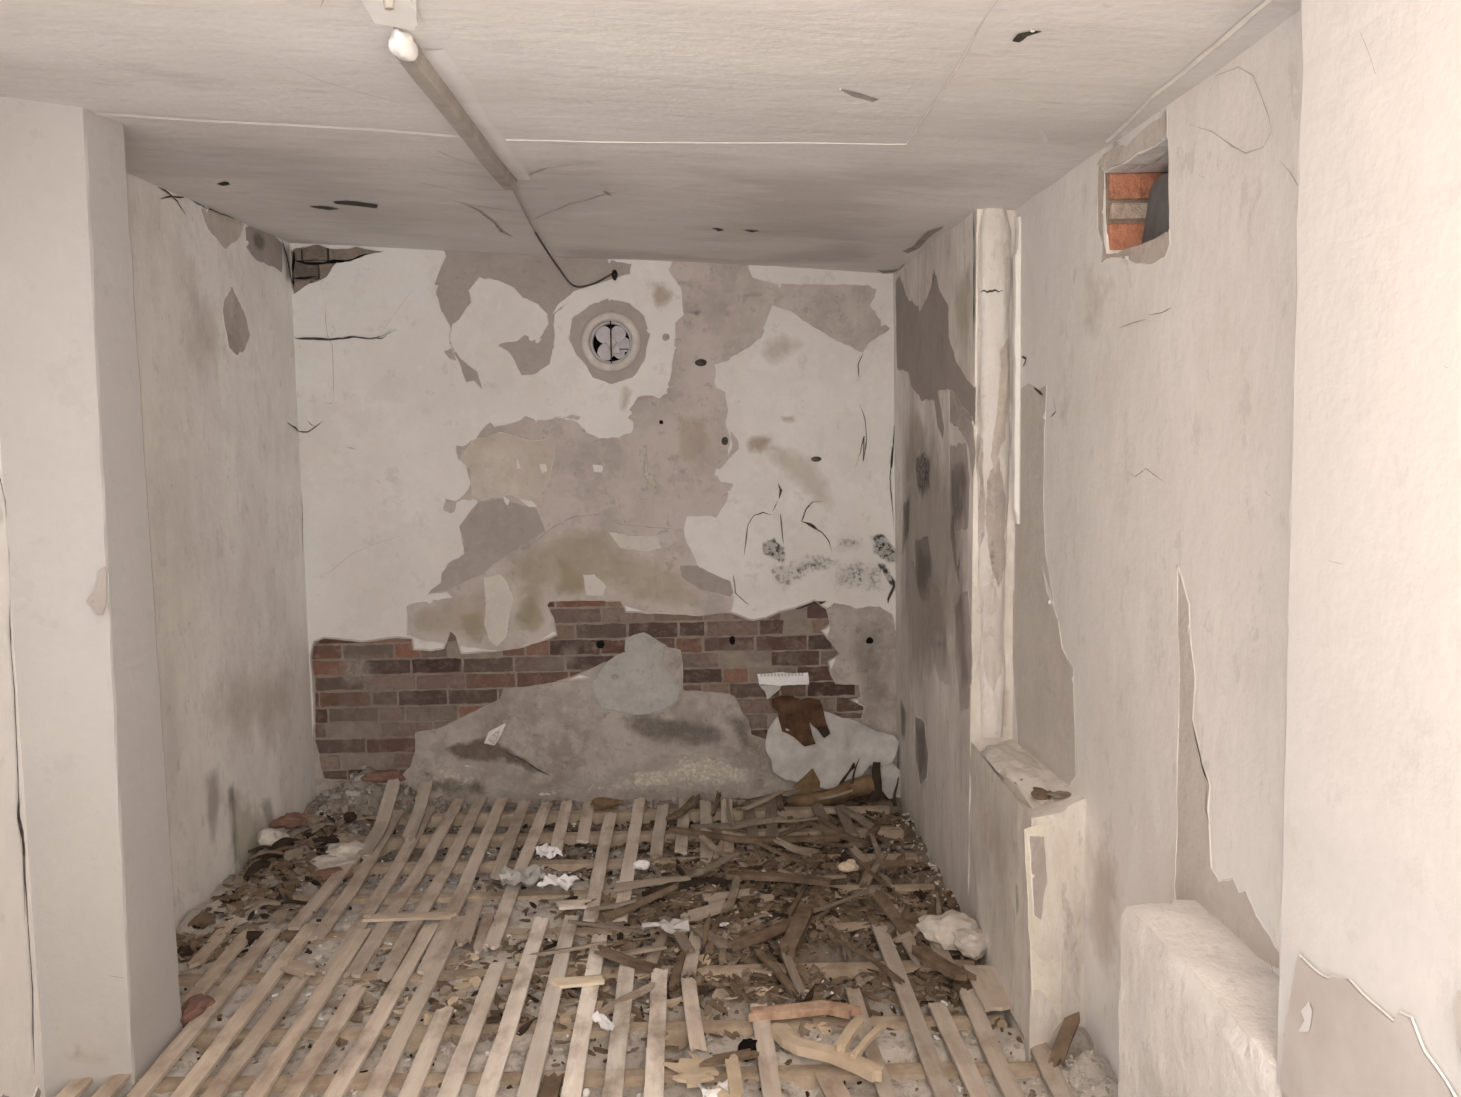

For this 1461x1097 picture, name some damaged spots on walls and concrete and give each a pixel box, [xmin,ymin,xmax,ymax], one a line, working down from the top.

peeling [222,285,251,357]
flaking render [199,205,384,296]
crack [282,241,372,287]
crack [287,290,413,453]
crack [858,354,895,524]
flaking render [1097,108,1171,266]
peeling [310,251,977,805]
crack [733,483,832,603]
damp [764,539,825,584]
damp [845,534,895,585]
crack [9,616,34,1049]
peeling [1174,564,1457,1097]